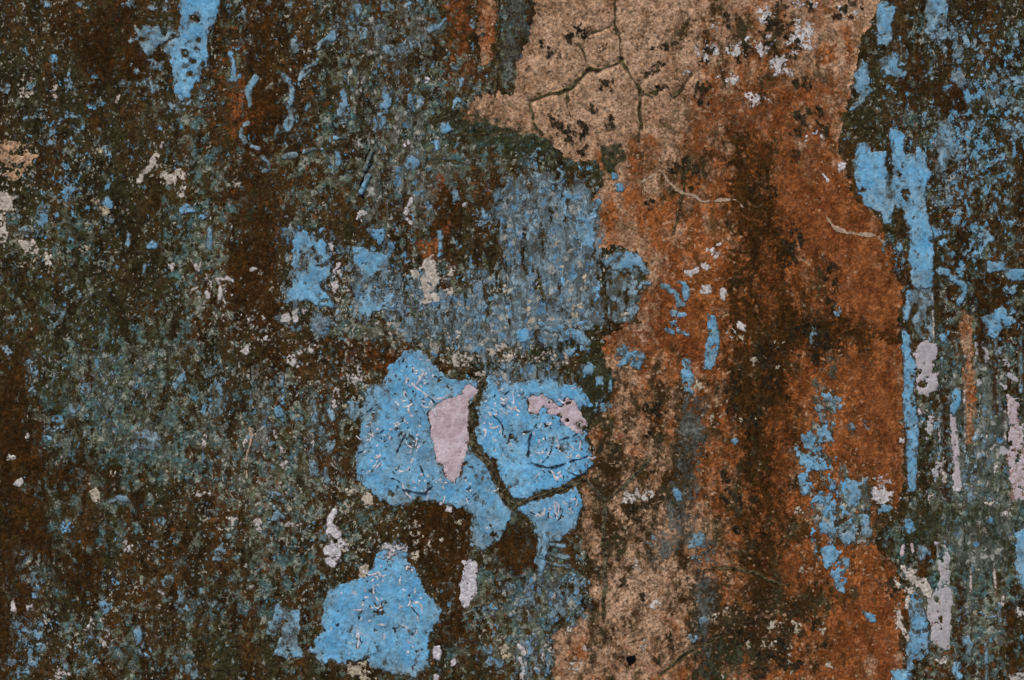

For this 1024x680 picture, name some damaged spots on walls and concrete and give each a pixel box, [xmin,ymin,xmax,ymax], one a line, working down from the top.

corrosion [224,74,263,136]
crack [427,0,743,236]
corrosion [687,77,898,331]
corrosion [620,276,709,369]
flaking render [305,0,1024,680]
peeling [241,371,286,453]
corrosion [845,346,904,488]
crack [464,376,662,623]
corrosion [765,407,806,599]
peeling [265,540,443,680]
corrosion [819,591,909,680]